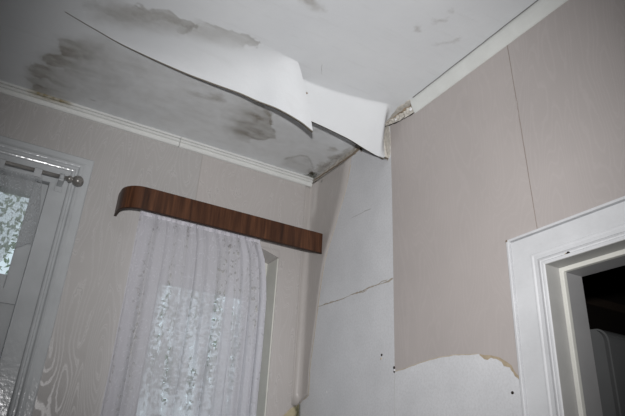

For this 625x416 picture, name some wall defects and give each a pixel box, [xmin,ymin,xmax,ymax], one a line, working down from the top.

flaking render [384,100,414,158]
crack [318,278,393,307]